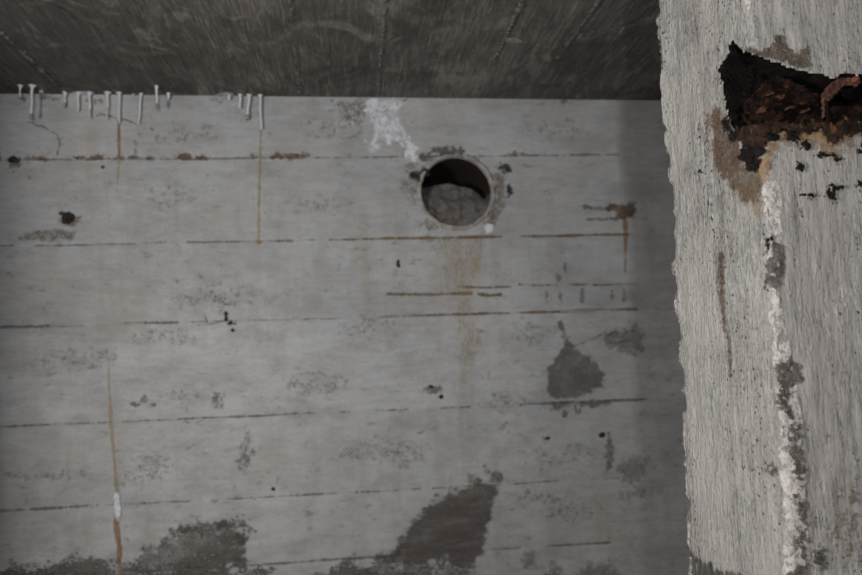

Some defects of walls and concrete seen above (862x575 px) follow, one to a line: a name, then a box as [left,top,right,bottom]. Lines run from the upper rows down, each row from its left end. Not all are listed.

corrosion [116,120,154,178]
corrosion [249,130,310,244]
leakage [331,98,420,162]
corrosion [704,107,862,216]
spalling [717,35,862,173]
leakage [547,342,607,417]
peeling [761,180,829,575]
corrosion [113,464,122,575]
leakage [0,516,275,575]
leakage [315,466,503,575]